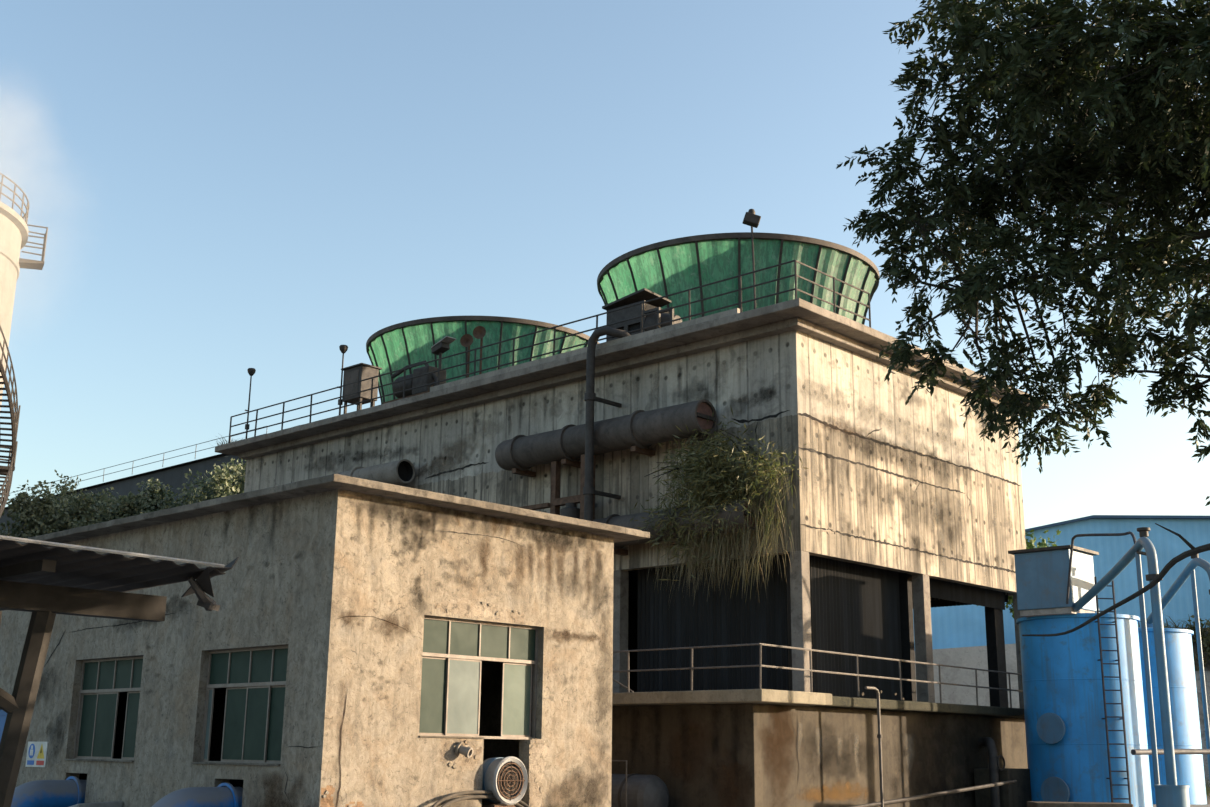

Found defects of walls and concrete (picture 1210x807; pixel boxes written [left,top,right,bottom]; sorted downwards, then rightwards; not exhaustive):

crack [284,686,348,807]